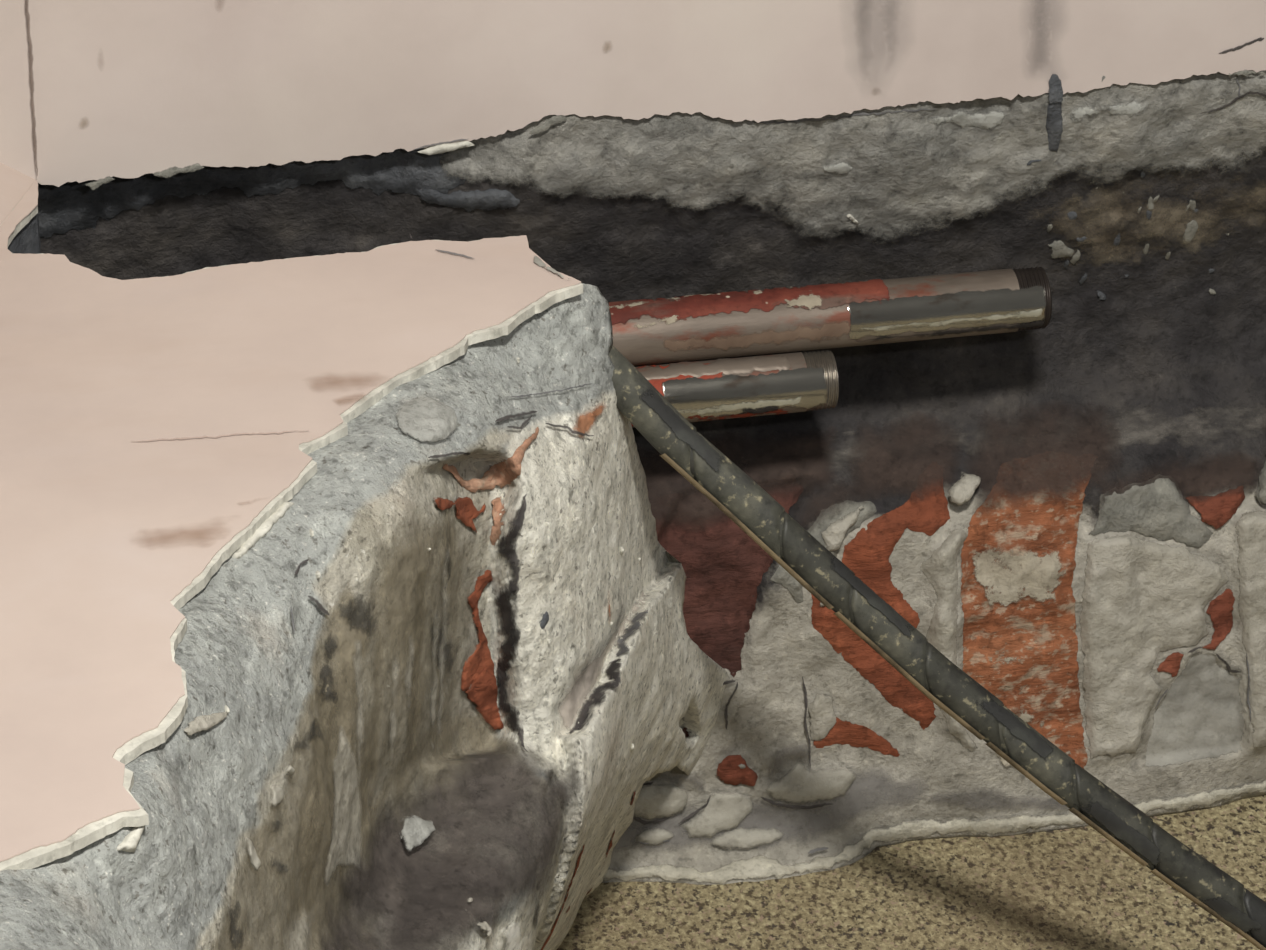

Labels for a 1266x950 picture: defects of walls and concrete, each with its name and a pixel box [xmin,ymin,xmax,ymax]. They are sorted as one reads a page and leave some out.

flaking render [38,70,1266,238]
water stain [220,519,574,950]
crack [428,451,471,459]
crack [495,494,528,752]
crack [495,384,594,436]
rust [574,405,604,437]
spalling [560,593,648,734]
flaking render [639,454,773,677]
flaking render [806,594,936,730]
flaking render [830,418,954,639]
flaking render [960,411,1112,769]
rust [541,844,585,950]